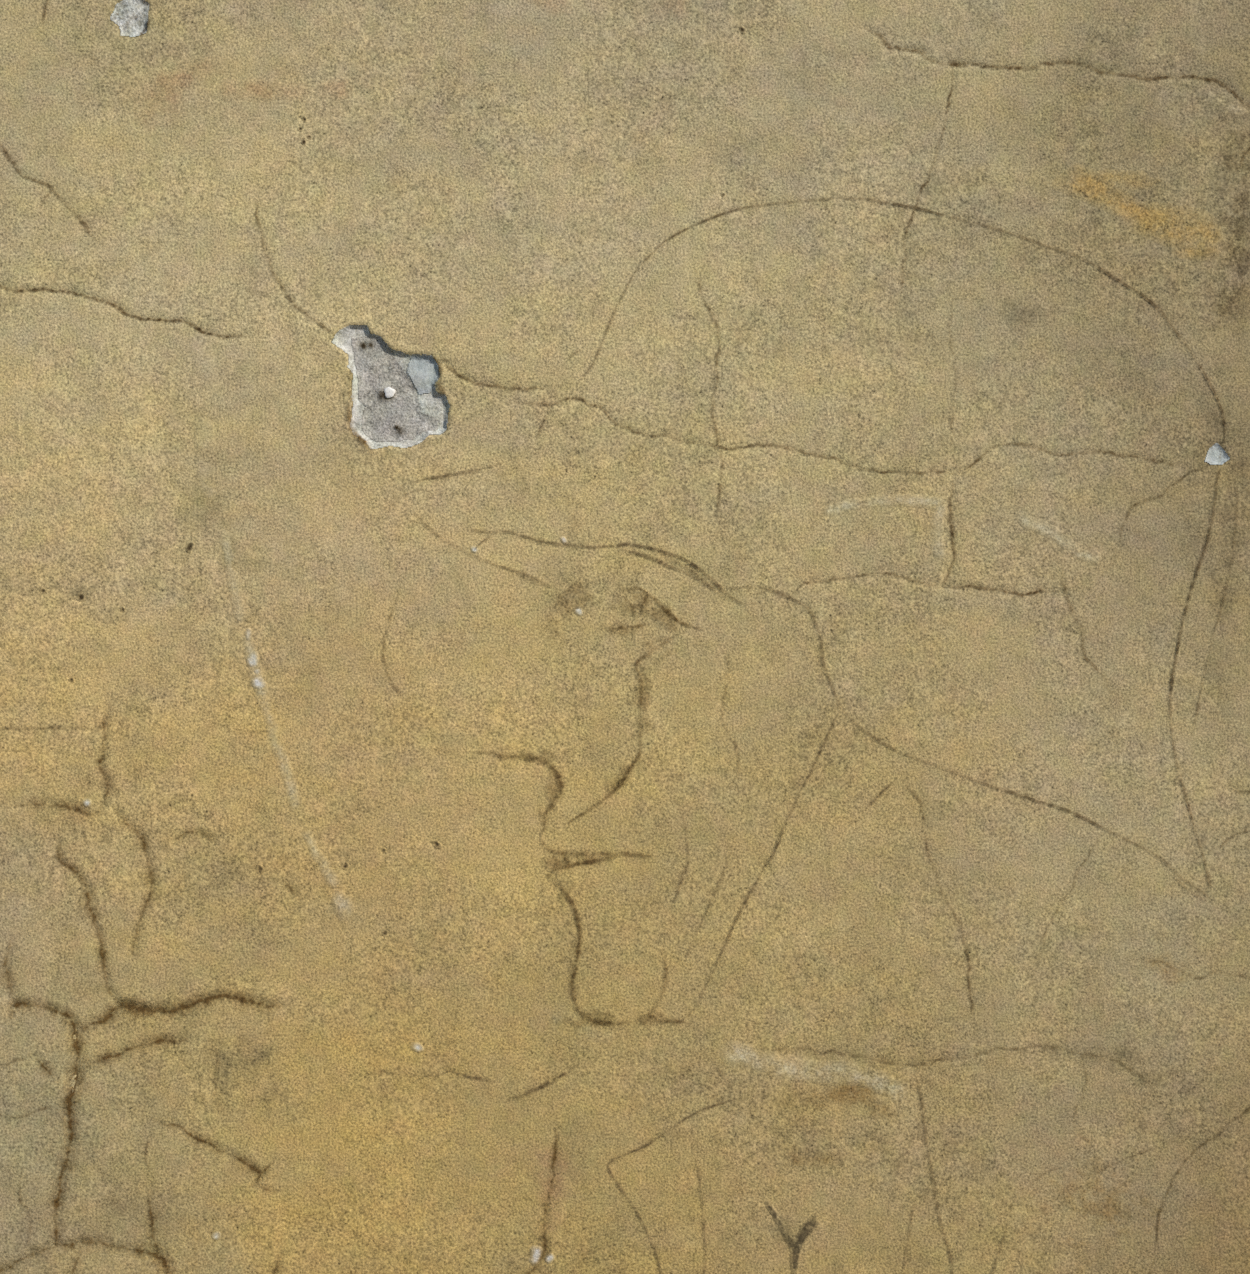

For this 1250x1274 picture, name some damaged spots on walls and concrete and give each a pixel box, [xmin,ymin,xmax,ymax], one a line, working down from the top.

spalling [110,0,149,37]
crack [944,62,1241,129]
crack [3,149,89,233]
crack [0,285,234,338]
spalling [332,325,450,449]
spalling [1205,443,1230,465]
crack [948,502,956,553]
crack [967,584,1071,608]
crack [35,721,109,815]
crack [57,850,106,970]
crack [125,823,154,933]
crack [0,961,274,1273]